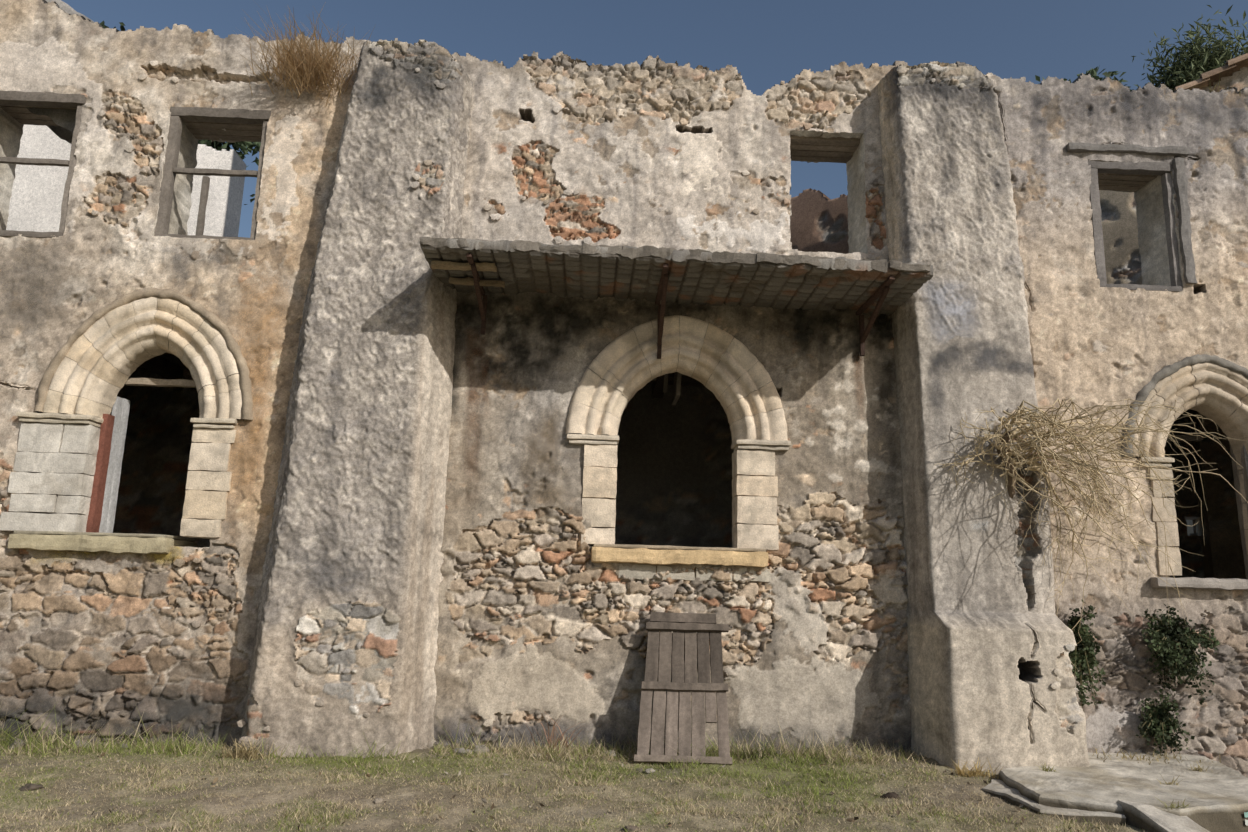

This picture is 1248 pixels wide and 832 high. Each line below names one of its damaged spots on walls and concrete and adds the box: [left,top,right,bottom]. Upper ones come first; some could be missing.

flaking render [0,36,164,239]
spalling [138,61,280,86]
flaking render [146,112,305,260]
spalling [512,54,791,253]
crack [997,93,1020,250]
crack [0,381,35,391]
crack [1024,281,1033,362]
spalling [166,551,242,628]
spalling [295,599,401,719]
flaking render [724,562,882,750]
crack [1014,467,1045,743]
flaking render [1050,644,1149,754]